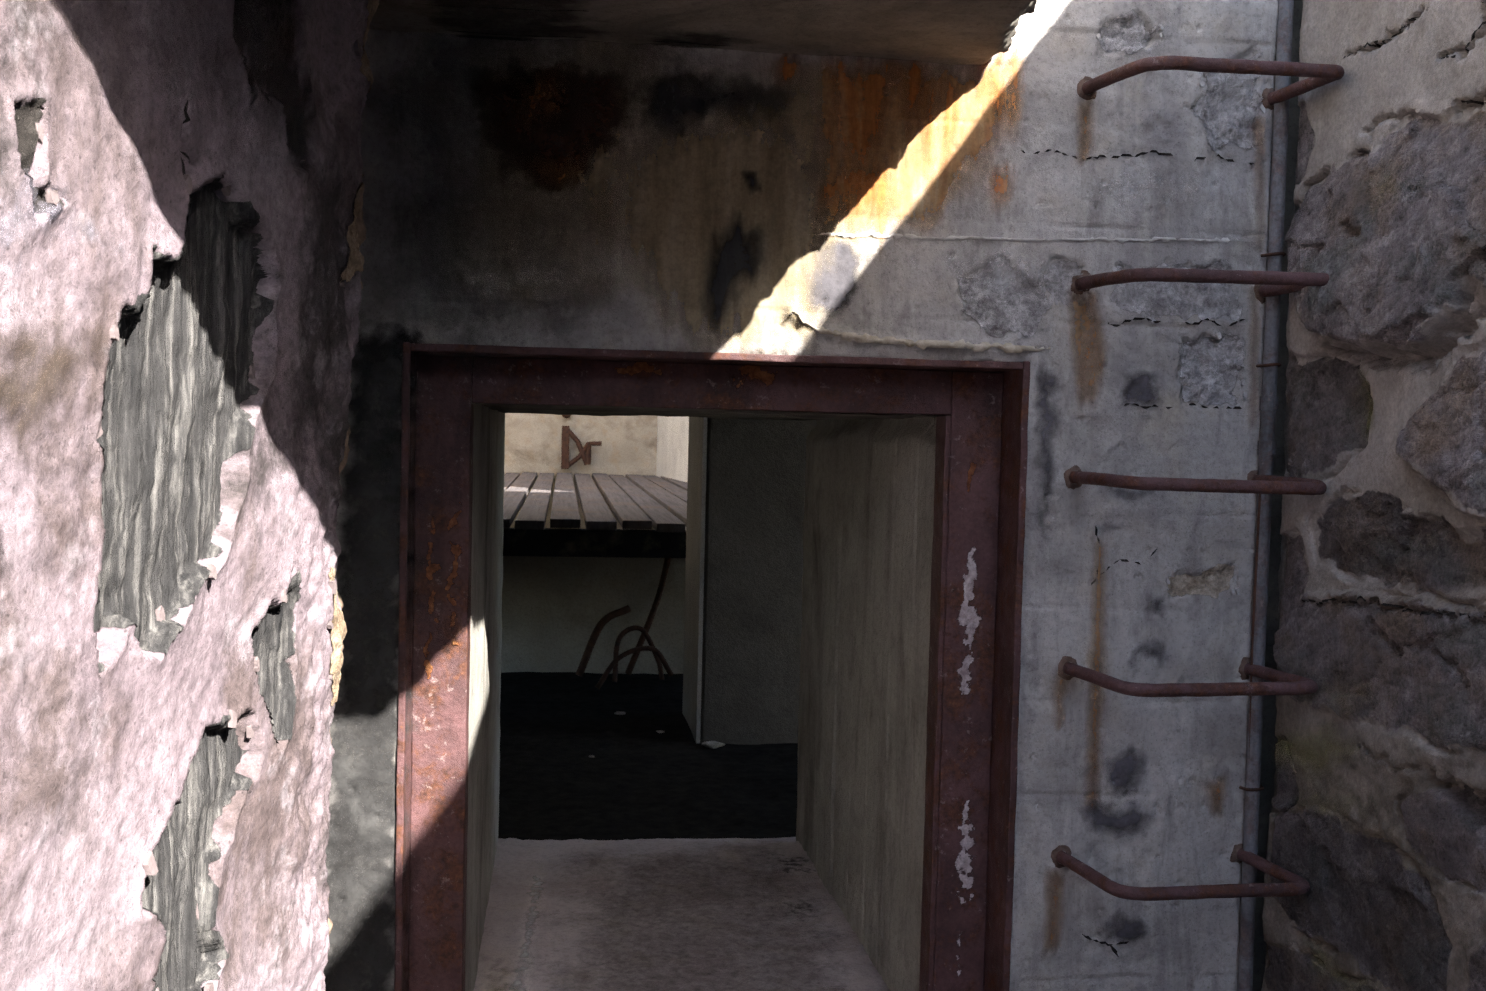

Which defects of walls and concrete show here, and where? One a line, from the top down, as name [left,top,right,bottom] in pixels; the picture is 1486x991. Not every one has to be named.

leakage [474,67,1051,353]
rust [820,48,1018,239]
peeling [93,174,274,654]
leakage [1036,370,1057,501]
peeling [251,570,302,743]
spalling [327,567,347,706]
peeling [957,548,982,695]
peeling [142,709,254,991]
peeling [955,800,975,904]